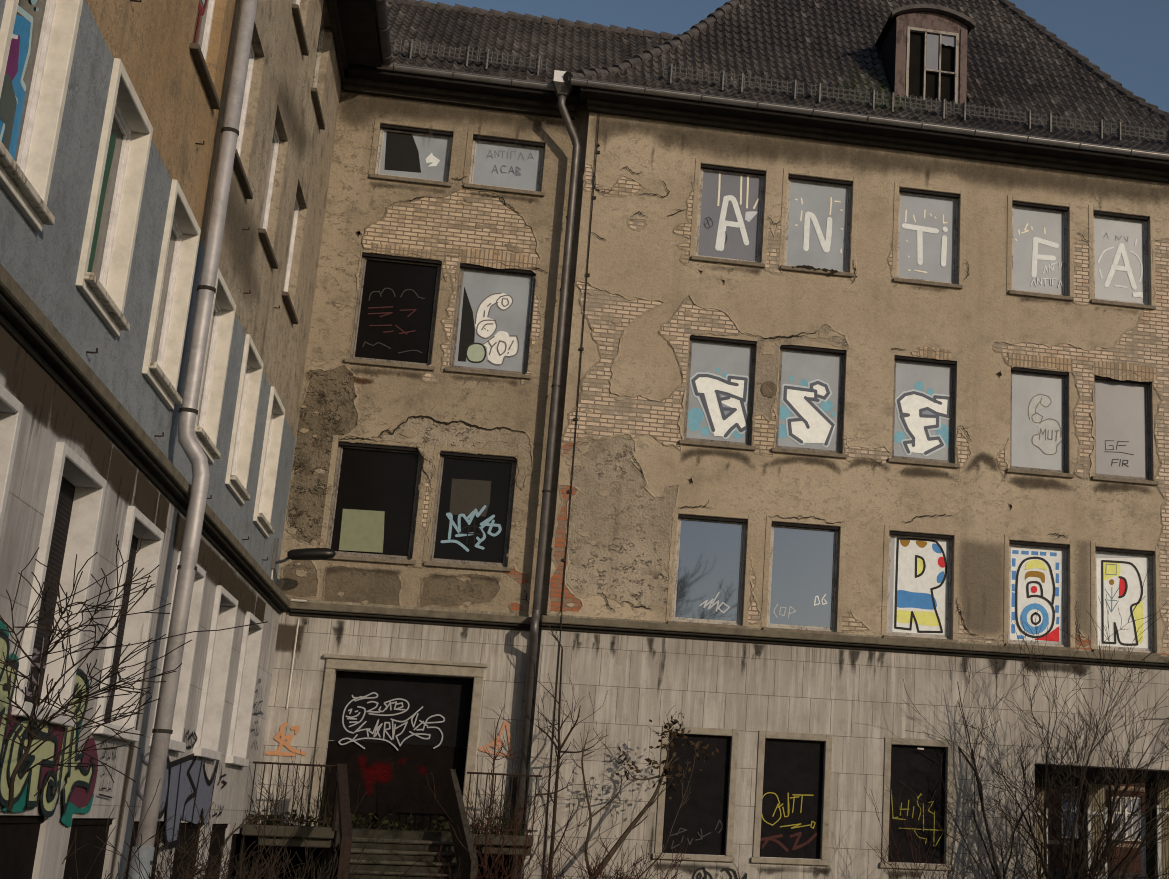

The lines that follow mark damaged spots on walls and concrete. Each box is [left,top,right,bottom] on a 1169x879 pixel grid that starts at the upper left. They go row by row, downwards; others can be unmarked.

flaking render [582,163,646,198]
spalling [792,233,858,283]
water stain [0,324,186,551]
flaking render [280,188,543,613]
spalling [547,279,743,615]
spalling [752,323,851,458]
flaking render [992,237,1169,655]
water stain [197,538,266,622]
water stain [275,619,306,651]